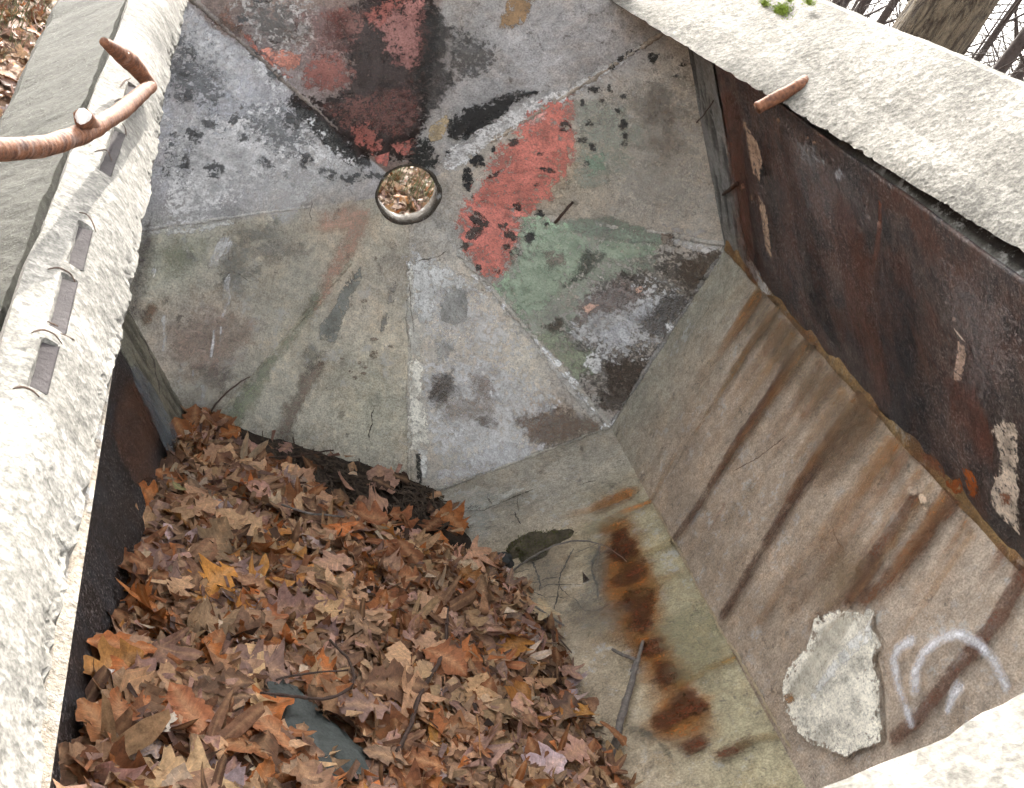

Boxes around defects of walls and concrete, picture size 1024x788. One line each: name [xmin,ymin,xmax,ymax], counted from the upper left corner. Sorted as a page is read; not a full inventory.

peeling [0,0,675,430]
peeling [742,121,762,181]
peeling [741,184,772,257]
rust [726,287,763,339]
rust [670,305,830,544]
rust [719,387,879,619]
rust [830,436,978,606]
spalling [991,420,1020,535]
rust [600,488,780,759]
rust [890,561,1024,745]